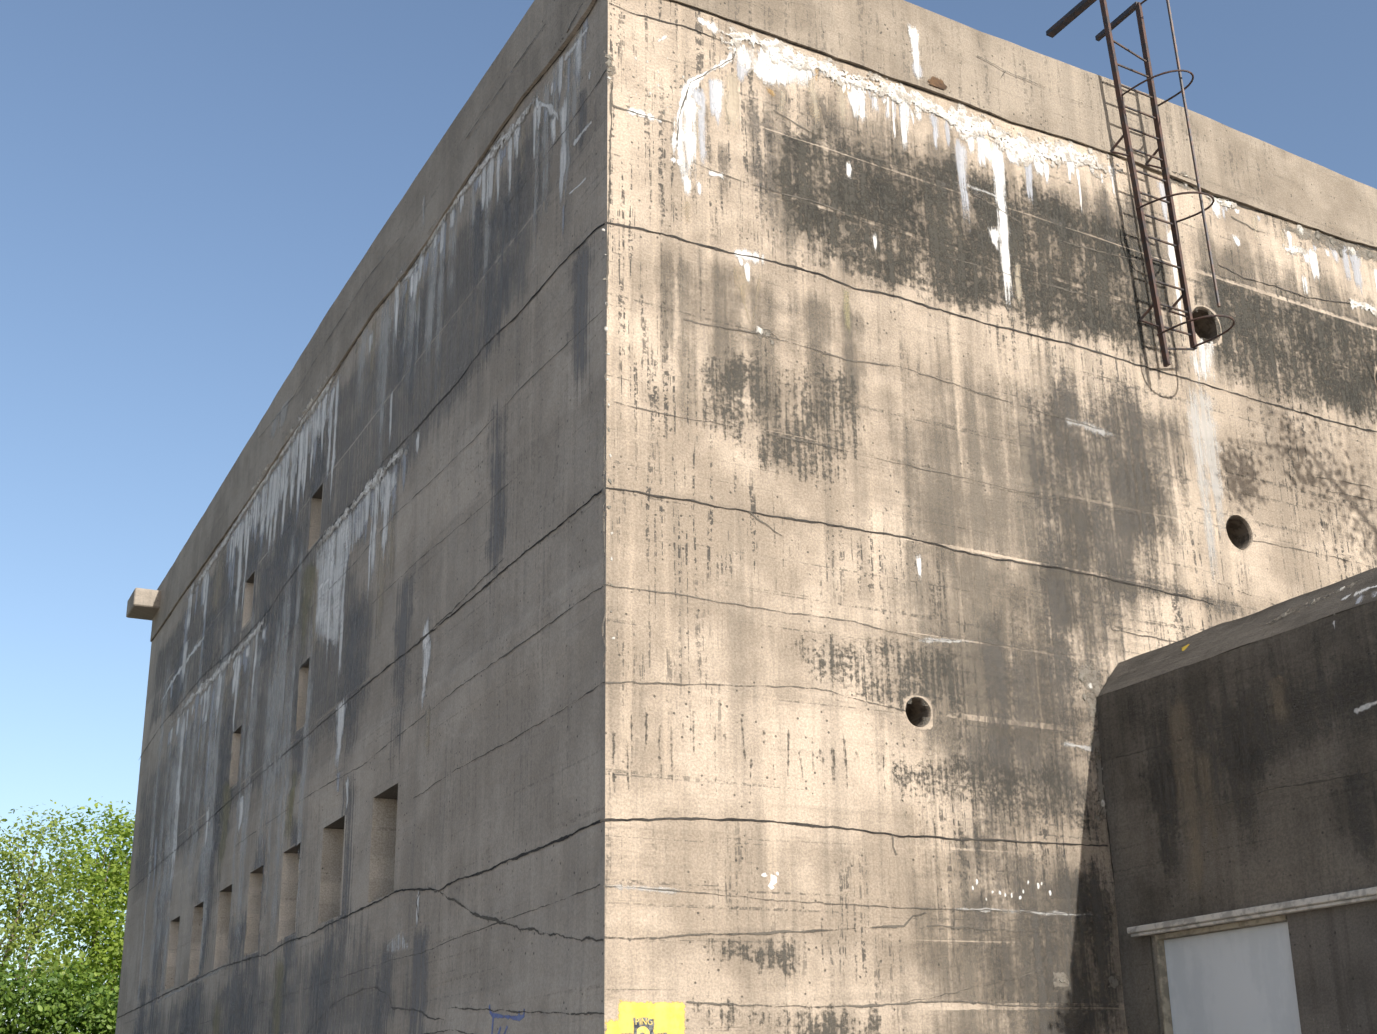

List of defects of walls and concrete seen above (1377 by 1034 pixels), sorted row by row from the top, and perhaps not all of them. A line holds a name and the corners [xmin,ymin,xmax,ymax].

water stain [627,18,1377,424]
water stain [695,268,864,497]
water stain [134,17,591,1034]
crack [118,758,1121,1034]
water stain [916,841,1117,1034]